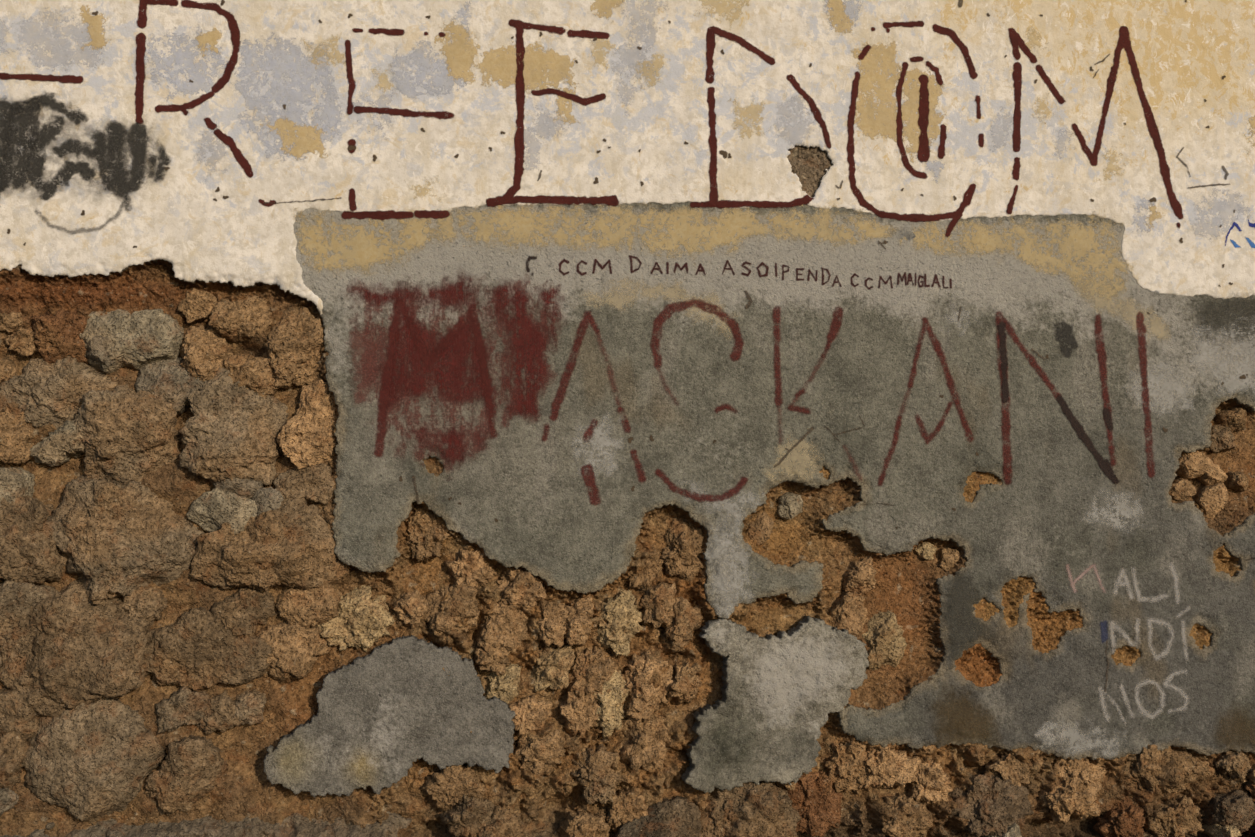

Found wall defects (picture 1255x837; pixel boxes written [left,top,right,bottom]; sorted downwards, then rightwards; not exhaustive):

peeling [295,97,1128,299]
spalling [1213,544,1242,577]
spalling [973,576,1083,654]
spalling [955,643,1002,687]